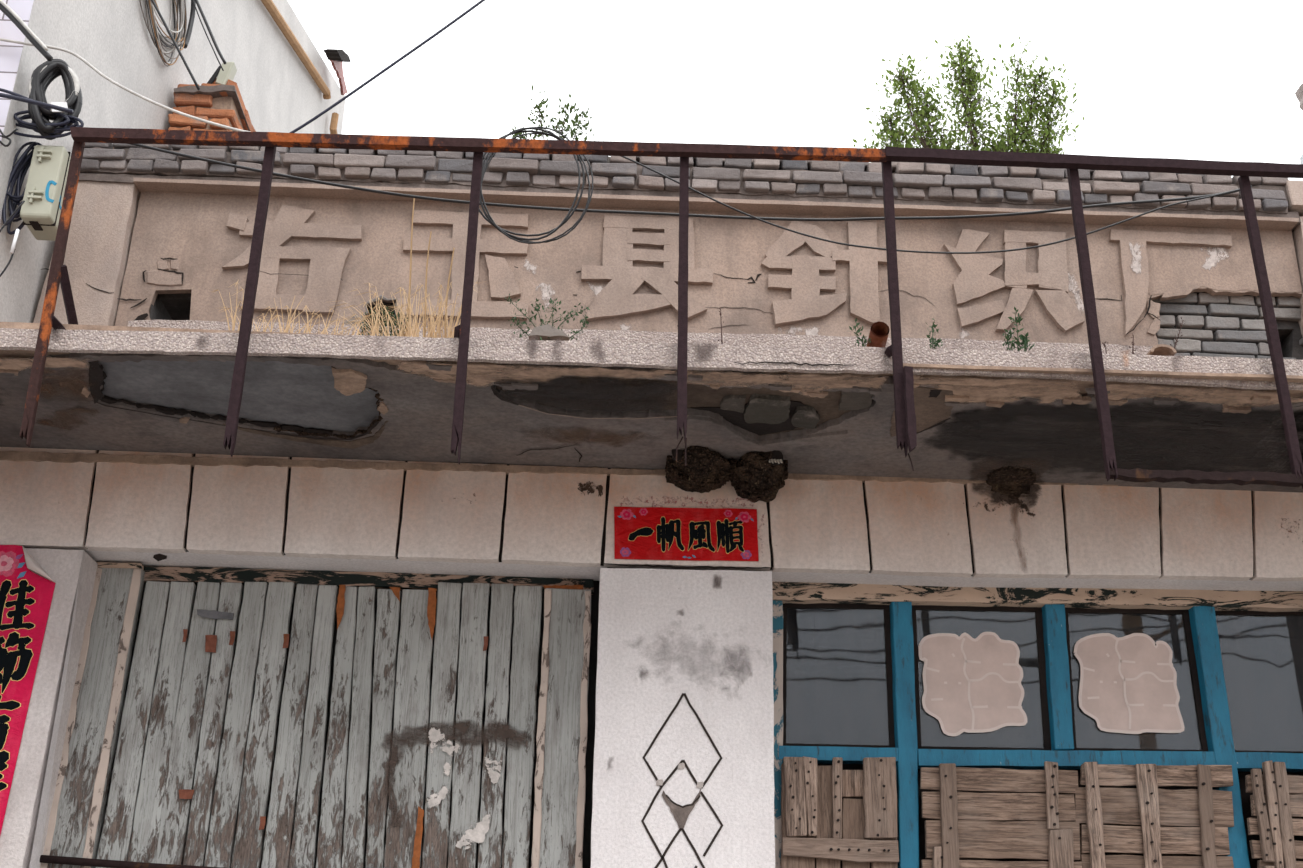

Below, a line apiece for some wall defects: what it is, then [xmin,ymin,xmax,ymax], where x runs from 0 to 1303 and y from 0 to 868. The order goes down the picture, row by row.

flaking render [1146,284,1303,360]
flaking render [0,357,388,449]
flaking render [398,362,885,452]
leakage [927,402,1303,473]